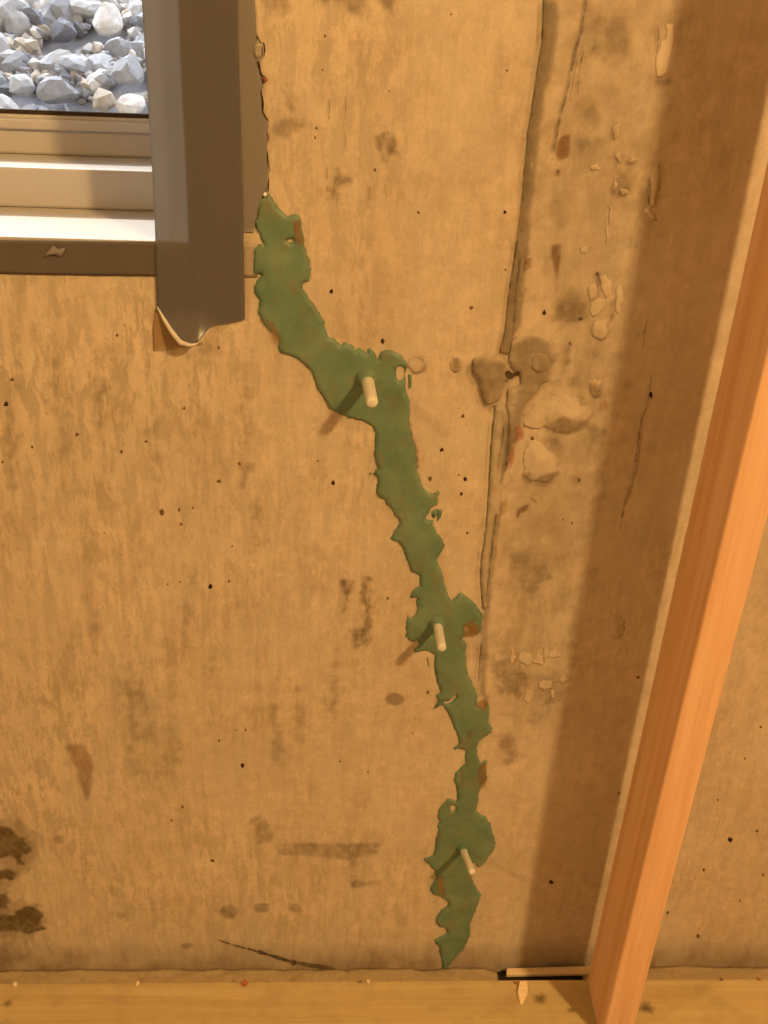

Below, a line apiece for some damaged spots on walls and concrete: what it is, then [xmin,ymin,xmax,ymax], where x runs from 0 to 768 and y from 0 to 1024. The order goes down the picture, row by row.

peeling [655,23,674,78]
peeling [588,274,624,317]
damp [0,828,30,880]
damp [0,895,46,934]
crack [220,940,334,969]